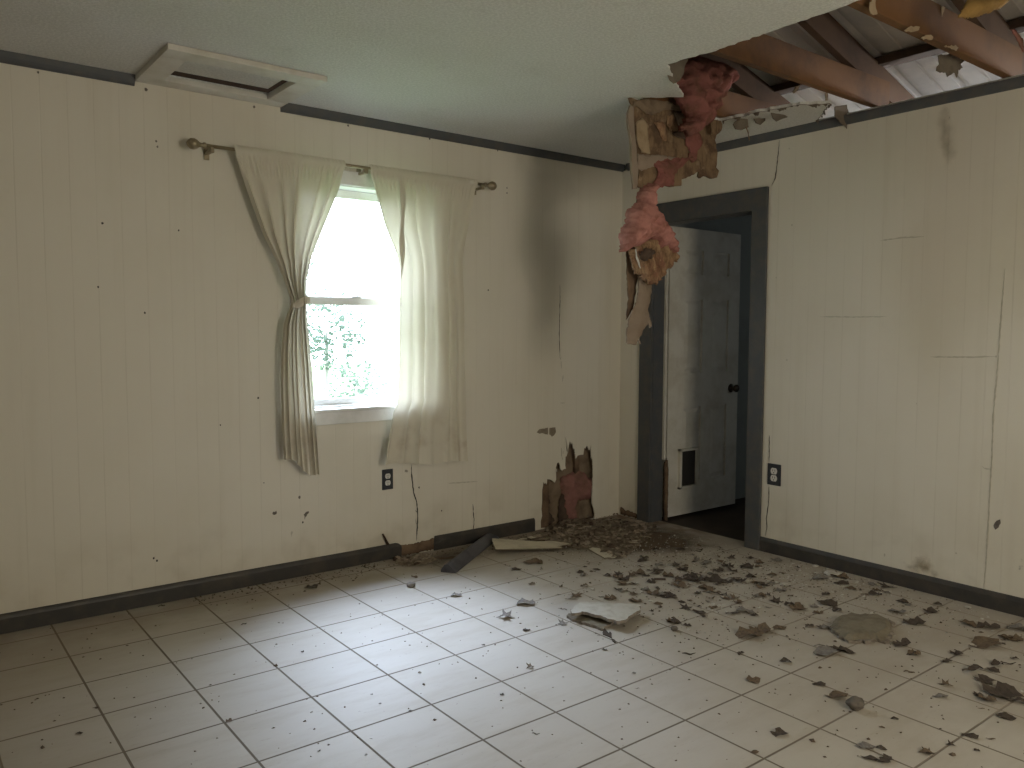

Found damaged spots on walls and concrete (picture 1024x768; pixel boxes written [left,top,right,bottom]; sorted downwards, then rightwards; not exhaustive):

peeling [537,427,556,436]
crack [982,270,1005,584]
crack [410,465,418,538]
spalling [541,443,594,528]